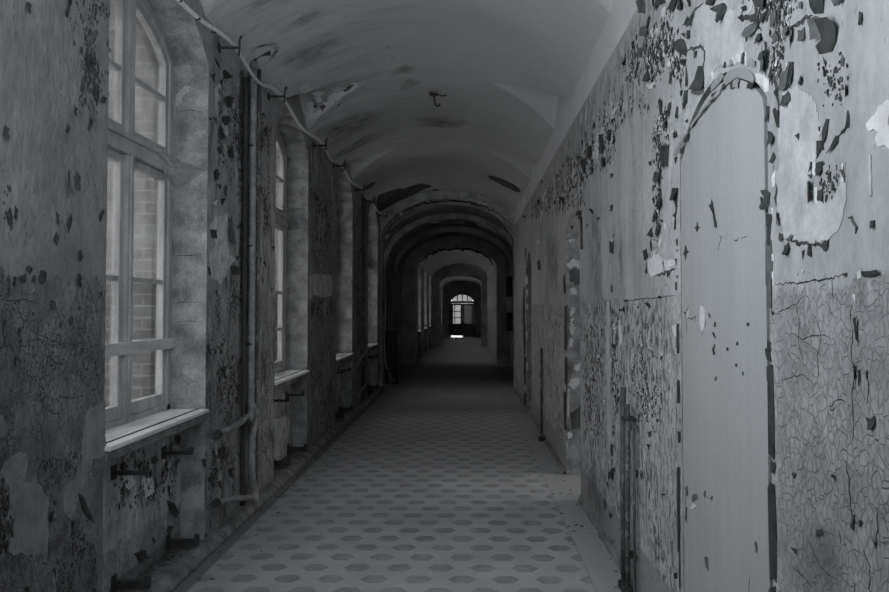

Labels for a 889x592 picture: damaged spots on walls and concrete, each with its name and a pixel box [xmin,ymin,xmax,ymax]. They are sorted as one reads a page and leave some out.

peeling [3,185,19,234]
peeling [65,0,111,131]
peeling [175,58,250,326]
peeling [488,175,521,193]
peeling [522,0,858,519]
peeling [866,100,889,148]
crack [775,240,878,441]
peeling [0,401,106,592]
peeling [114,436,181,532]
peeling [201,440,240,493]
spalling [674,467,714,589]
crack [839,461,879,592]